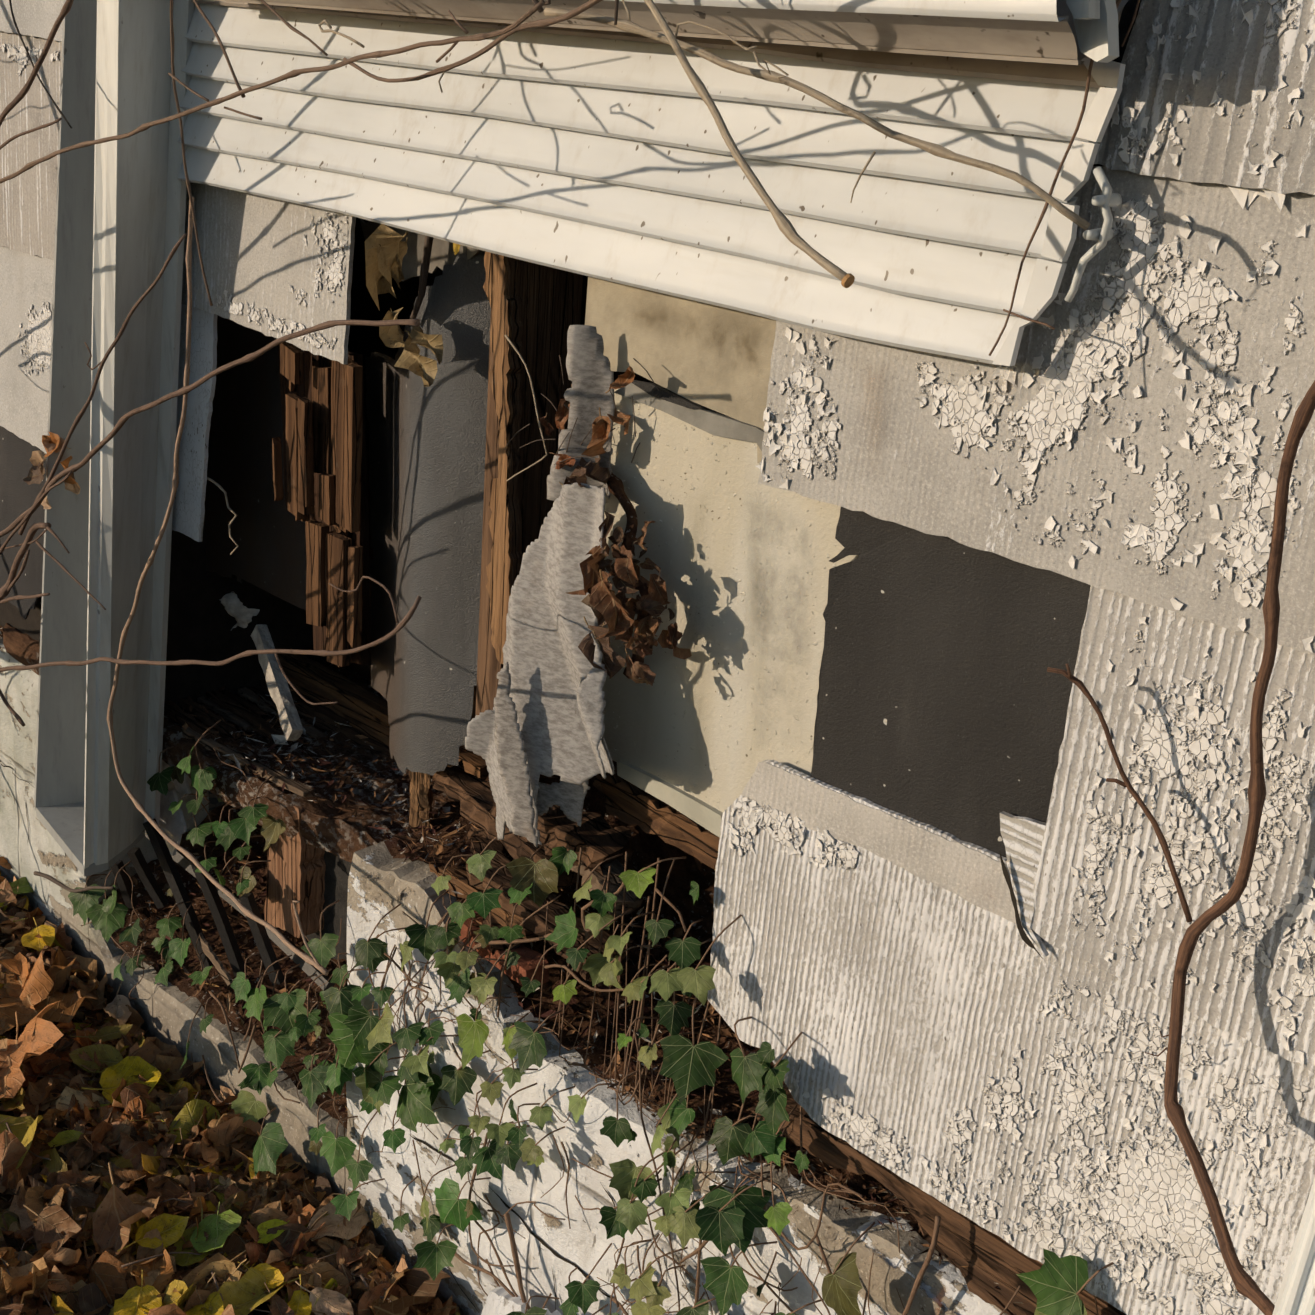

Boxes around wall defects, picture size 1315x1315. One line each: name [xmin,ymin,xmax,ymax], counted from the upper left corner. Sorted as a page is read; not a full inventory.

peeling [1108,0,1205,170]
peeling [1209,0,1315,211]
peeling [17,302,52,376]
peeling [216,289,336,350]
peeling [288,212,348,308]
peeling [756,326,841,490]
peeling [915,195,1306,632]
peeling [725,797,859,870]
peeling [1070,645,1315,1066]
crack [410,1135,455,1162]
peeling [788,977,1310,1315]
crack [487,1184,628,1309]